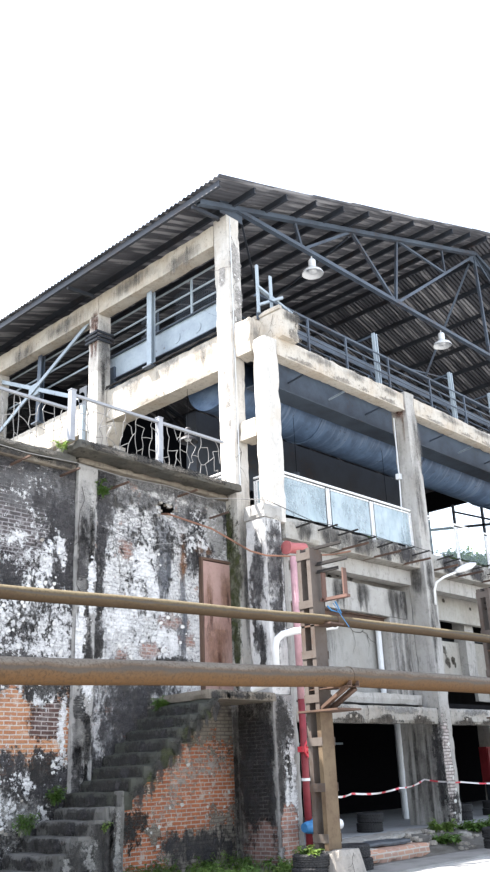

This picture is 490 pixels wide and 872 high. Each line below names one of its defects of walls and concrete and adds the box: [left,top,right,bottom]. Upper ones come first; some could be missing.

spalling [0,463,75,590]
peeling [87,555,97,593]
water stain [0,599,194,662]
peeling [0,599,198,662]
water stain [0,441,286,611]
peeling [114,501,227,603]
water stain [234,619,287,665]
flaking render [0,685,70,860]
water stain [0,685,201,872]
flaking render [123,726,236,872]
water stain [158,687,294,870]
spalling [332,711,490,824]